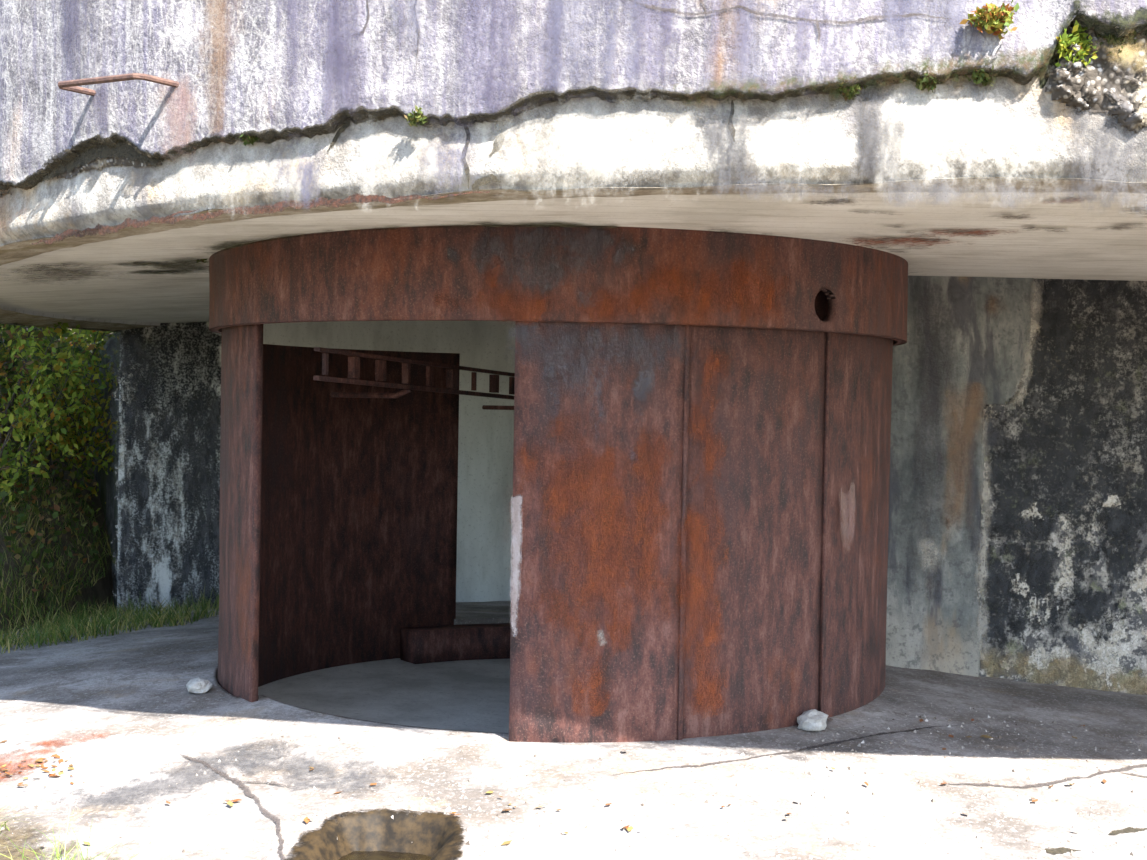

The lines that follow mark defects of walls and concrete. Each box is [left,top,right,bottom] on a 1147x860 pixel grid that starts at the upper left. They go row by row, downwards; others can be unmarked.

spalling [1039,0,1147,133]
corrosion [922,229,1013,237]
water stain [102,322,222,612]
water stain [969,279,1147,656]
corrosion [0,741,62,780]
crack [613,722,972,775]
crack [945,764,1147,788]
crack [179,753,303,860]
crack [1109,827,1147,835]